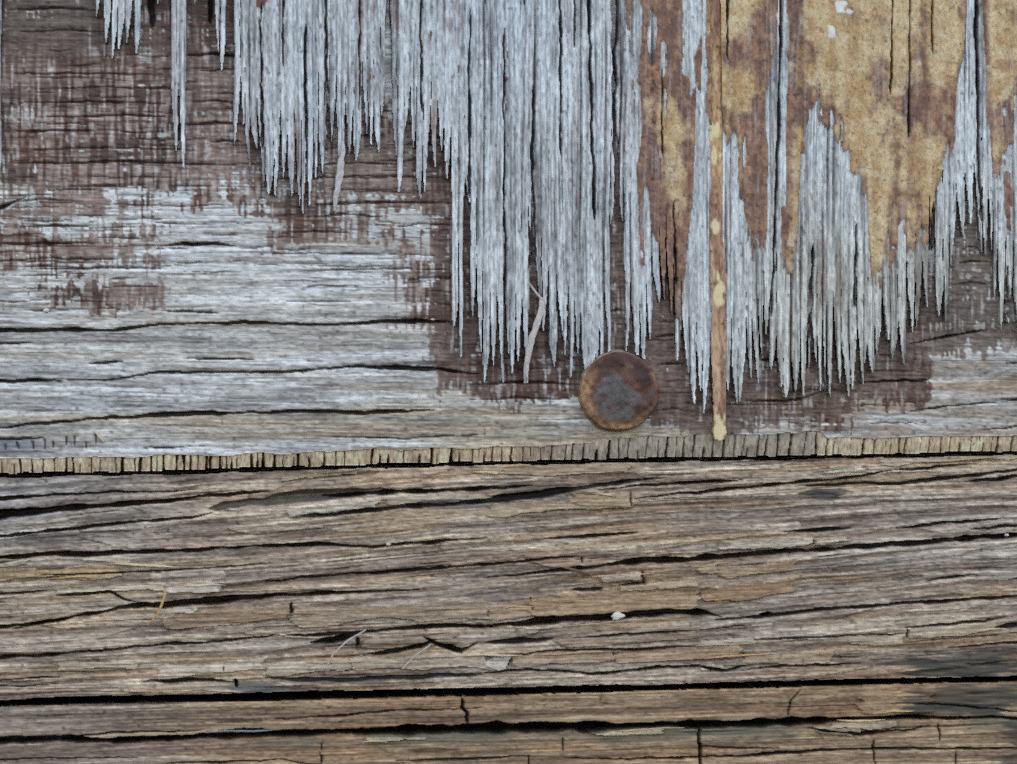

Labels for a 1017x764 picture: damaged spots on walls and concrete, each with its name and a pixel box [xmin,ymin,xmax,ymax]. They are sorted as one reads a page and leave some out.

peeling [982,0,1017,232]
peeling [625,0,967,321]
crack [167,240,233,248]
crack [0,319,450,333]
crack [0,376,60,384]
crack [0,409,430,429]
crack [88,365,478,381]
rust [578,367,642,431]
crack [296,471,885,518]
crack [966,474,1017,482]
crack [0,490,1017,628]
crack [0,595,1017,764]